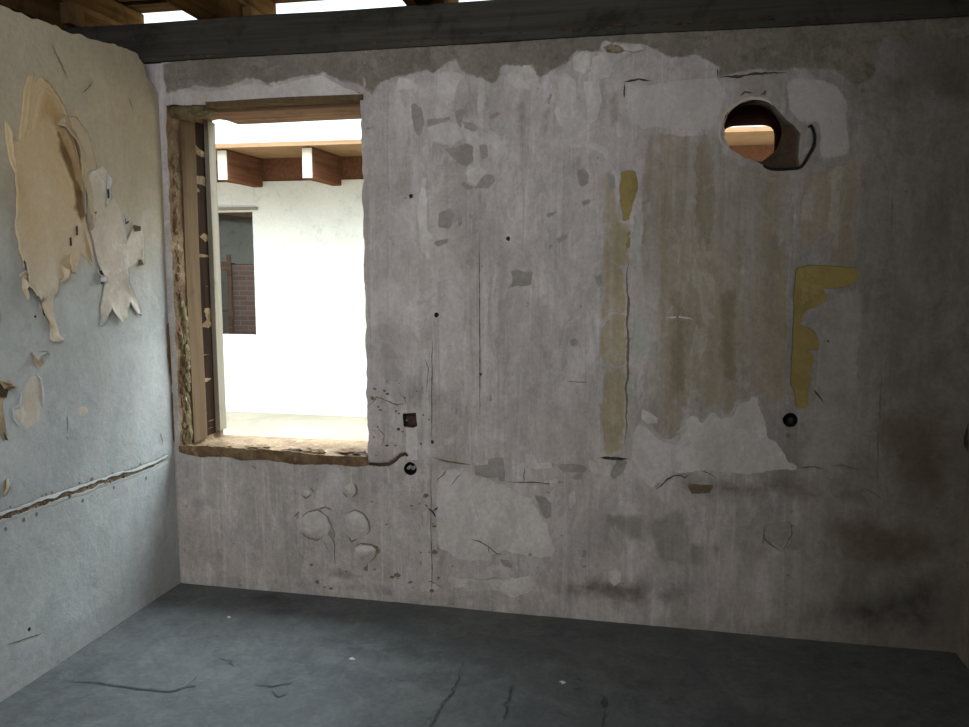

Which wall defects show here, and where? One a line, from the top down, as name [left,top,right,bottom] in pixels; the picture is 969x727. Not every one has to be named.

peeling [0,73,145,441]
peeling [161,17,969,598]
crack [423,666,462,727]